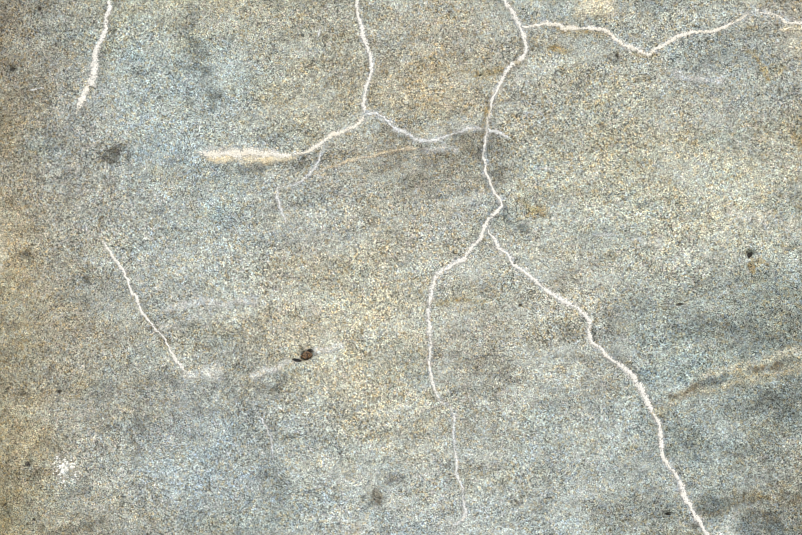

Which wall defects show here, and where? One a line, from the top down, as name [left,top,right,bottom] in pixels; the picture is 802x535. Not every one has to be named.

crack [76,0,113,117]
crack [86,226,185,372]
crack [197,0,802,535]